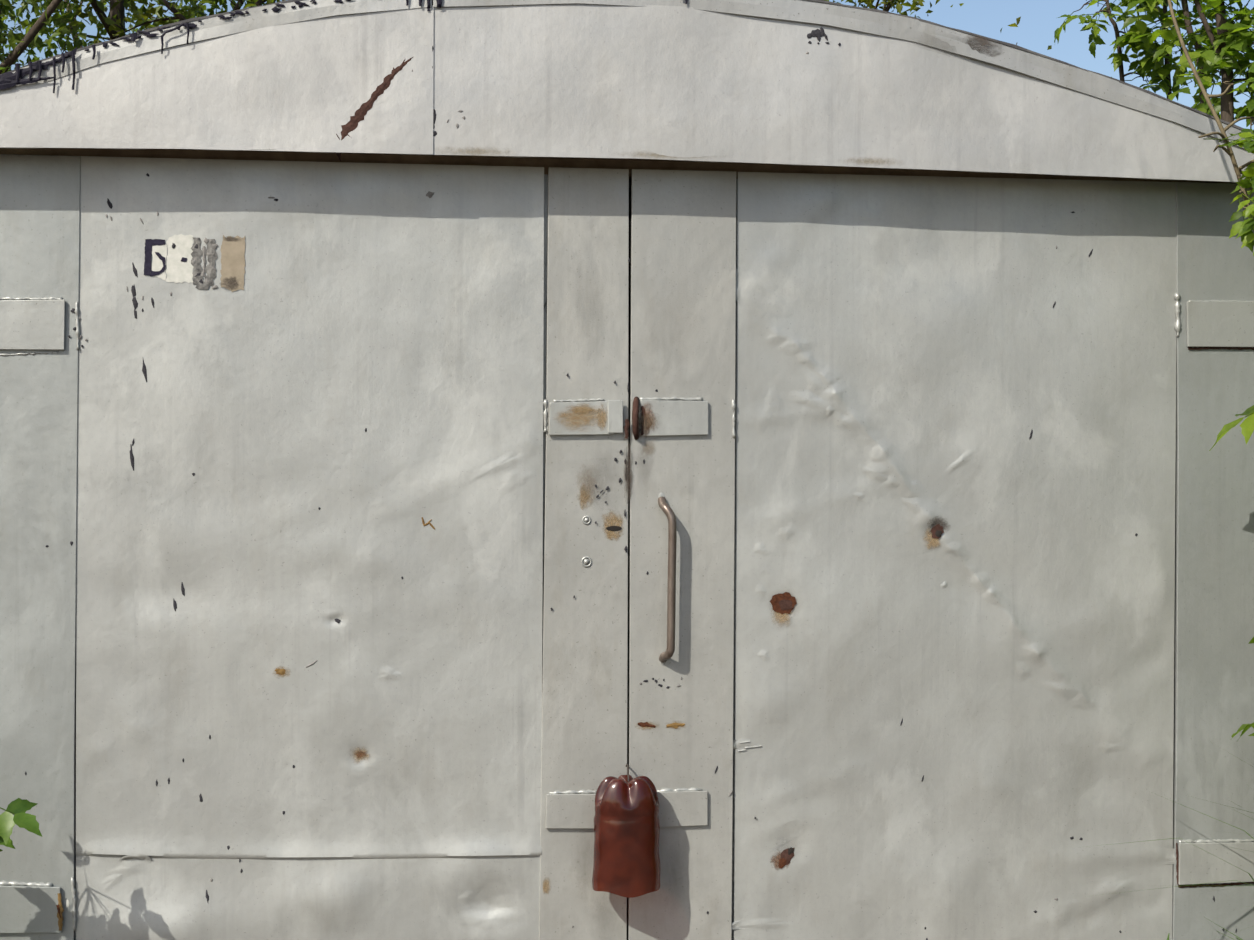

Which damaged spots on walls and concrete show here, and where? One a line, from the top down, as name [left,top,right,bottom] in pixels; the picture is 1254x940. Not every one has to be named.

corrosion [560,405,606,427]
corrosion [624,406,653,497]